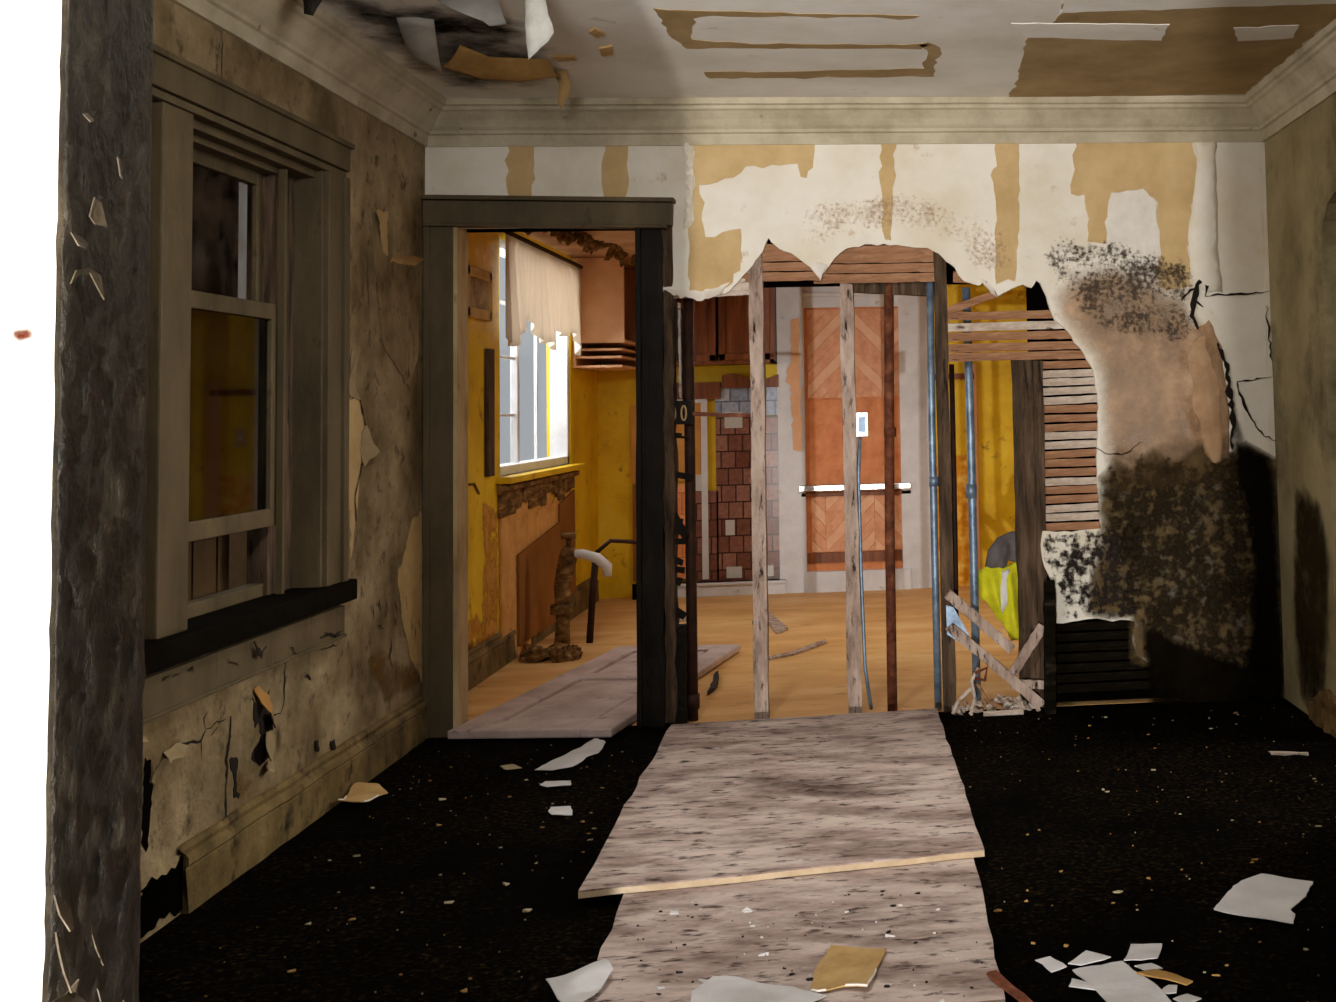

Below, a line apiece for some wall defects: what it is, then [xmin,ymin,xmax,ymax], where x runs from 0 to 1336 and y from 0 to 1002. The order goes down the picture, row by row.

flaking render [653,8,942,79]
flaking render [1009,3,1336,97]
flaking render [665,145,815,301]
flaking render [879,144,896,240]
flaking render [980,143,1020,297]
flaking render [1070,142,1197,290]
crack [1181,280,1275,450]
peeling [349,348,380,559]
water stain [1043,237,1328,701]
peeling [397,510,423,682]
crack [155,710,232,817]
spalling [140,856,183,939]